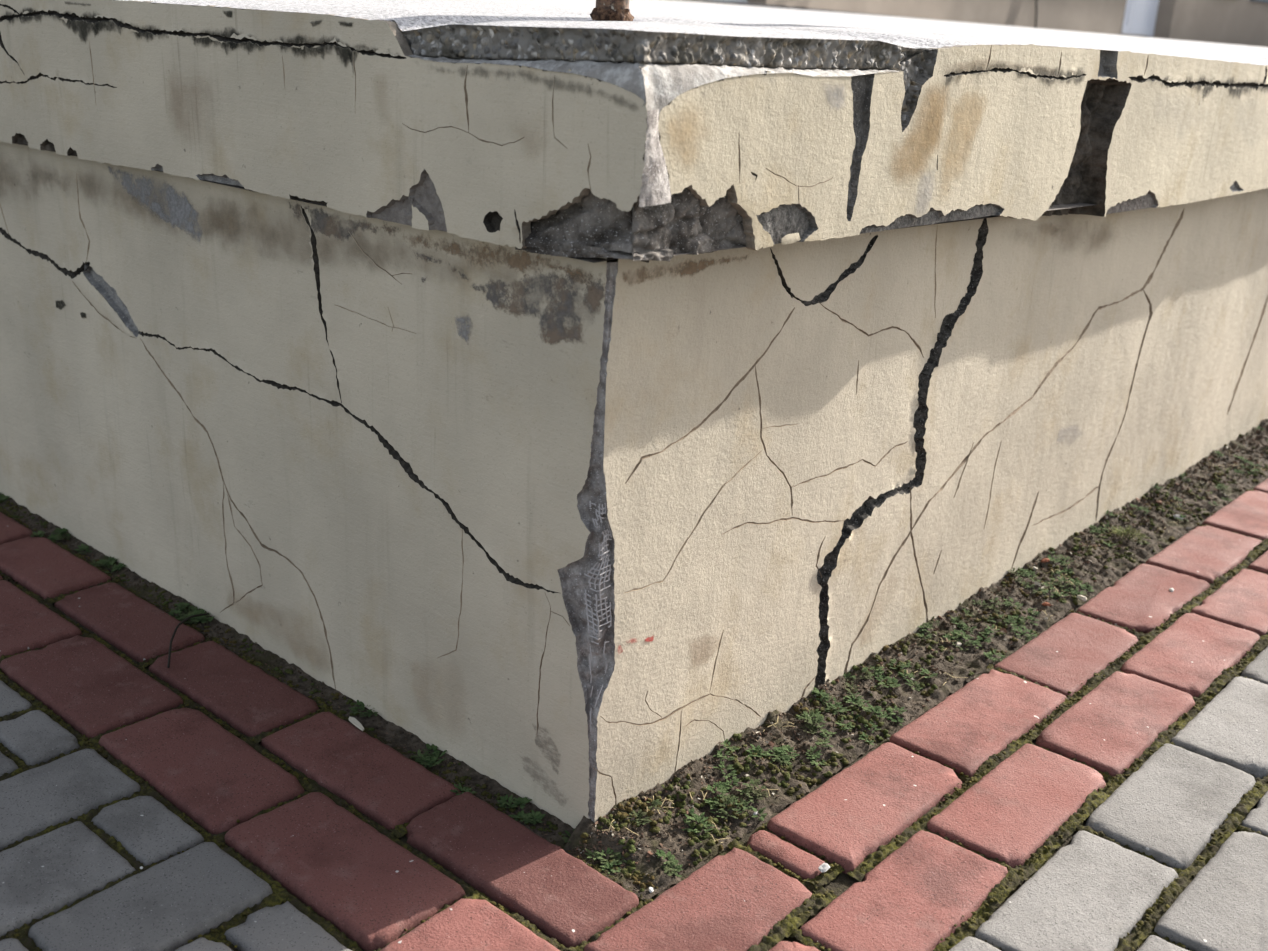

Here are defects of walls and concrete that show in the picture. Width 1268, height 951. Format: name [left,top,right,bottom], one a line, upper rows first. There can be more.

crack [0,4,406,114]
spalling [391,20,938,133]
crack [1129,57,1268,97]
crack [0,173,90,279]
flaking render [860,203,1004,234]
crack [623,74,1184,697]
crack [1227,296,1268,414]
crack [139,207,570,733]
spalling [366,169,818,822]